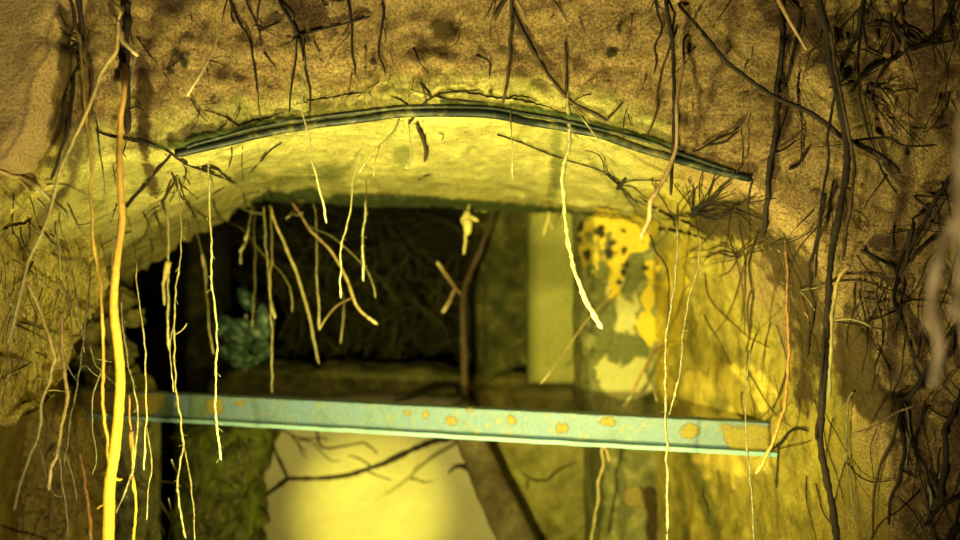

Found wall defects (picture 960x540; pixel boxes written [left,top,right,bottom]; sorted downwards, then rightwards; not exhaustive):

peeling [579,208,781,421]
rust [600,417,616,427]
rust [679,422,700,439]
rust [721,424,775,452]
peeling [691,453,776,489]